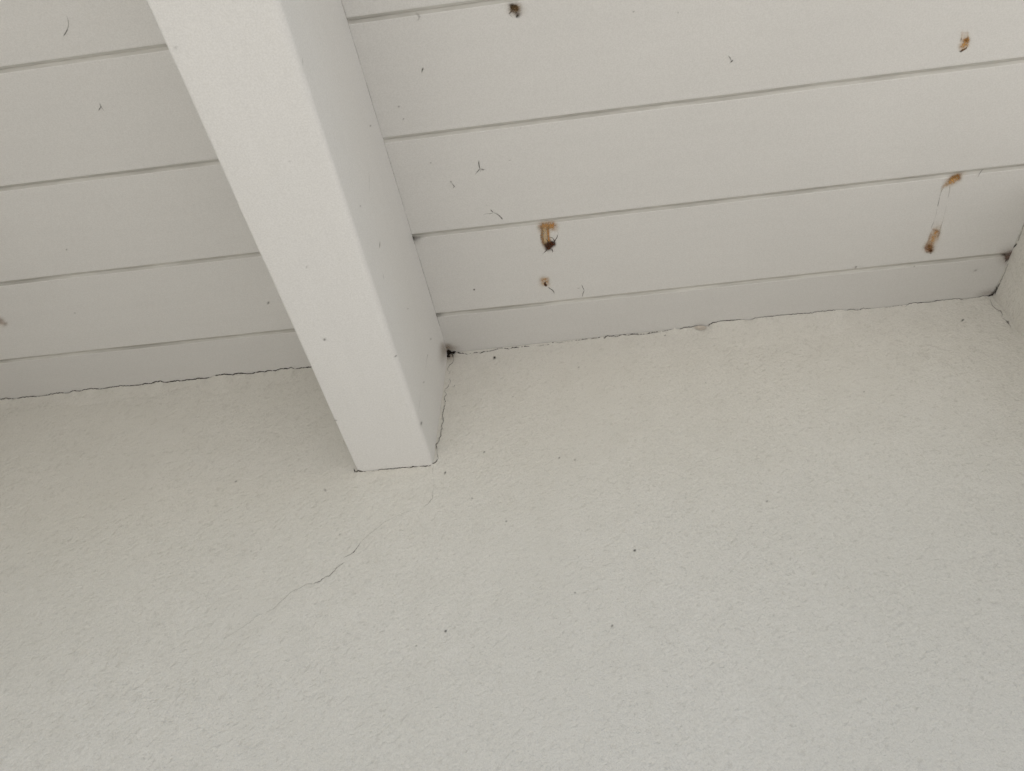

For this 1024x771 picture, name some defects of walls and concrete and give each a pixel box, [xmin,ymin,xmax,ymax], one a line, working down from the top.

rust [540,223,558,253]
crack [1,367,311,400]